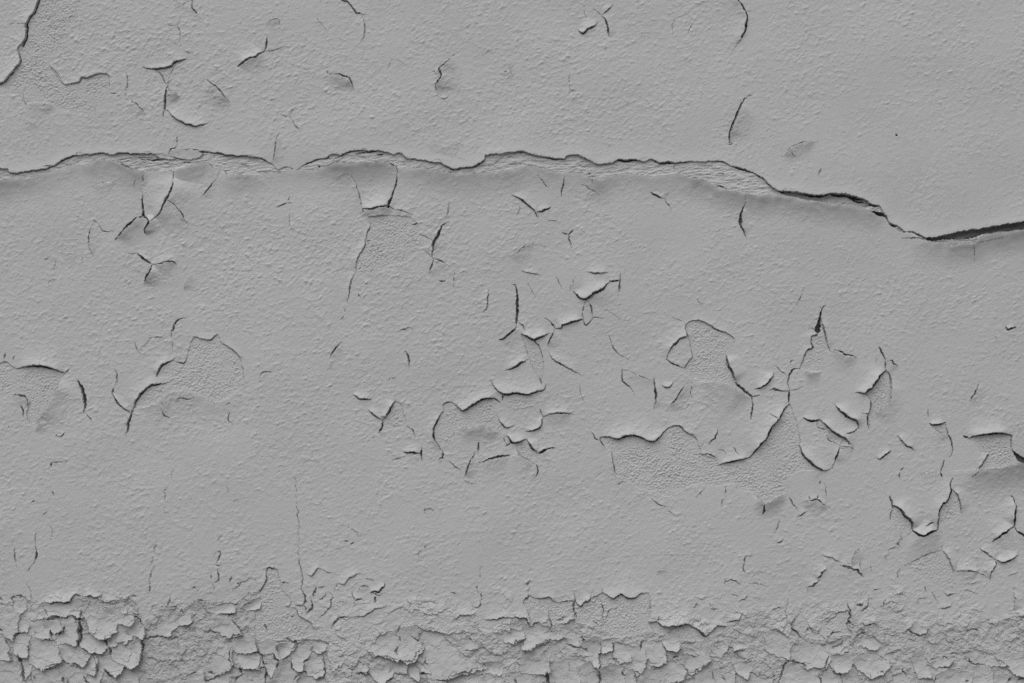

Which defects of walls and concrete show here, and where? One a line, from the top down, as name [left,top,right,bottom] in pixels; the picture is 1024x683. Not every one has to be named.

crack [238,38,268,70]
crack [725,0,748,47]
crack [729,99,753,140]
peeling [0,140,1024,305]
crack [515,175,598,237]
crack [653,191,667,199]
crack [739,196,751,235]
peeling [0,353,74,432]
peeling [425,290,582,477]
peeling [591,303,904,514]
peeling [351,417,1024,683]
peeling [0,562,403,683]